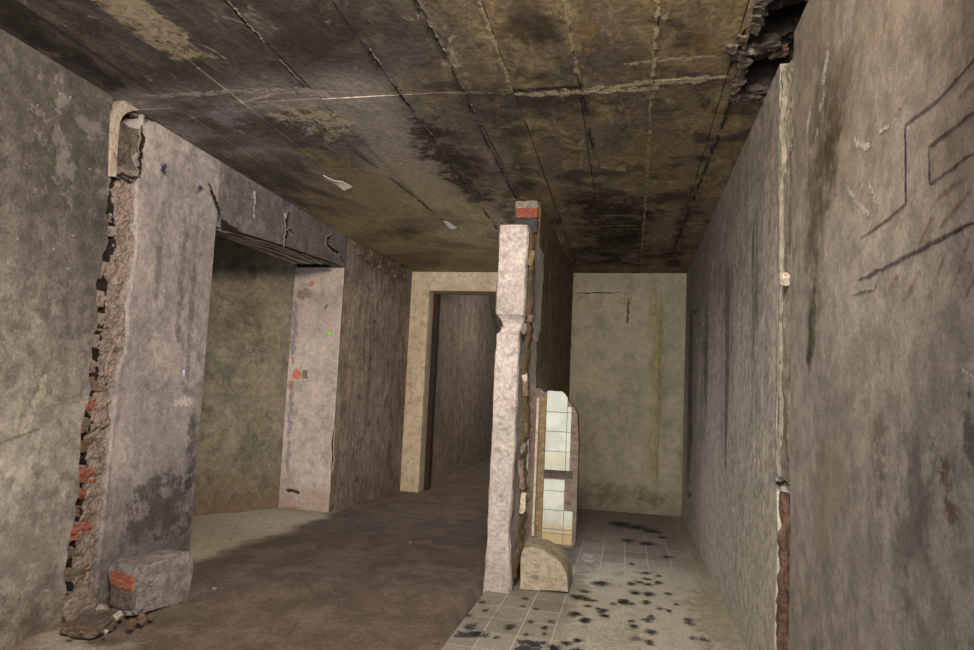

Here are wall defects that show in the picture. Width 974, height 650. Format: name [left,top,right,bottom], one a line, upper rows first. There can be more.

crack [225,0,307,88]
crack [283,211,293,247]
crack [312,118,446,221]
crack [366,47,498,230]
crack [414,0,517,199]
crack [578,80,595,148]
water stain [477,0,756,252]
crack [674,94,734,247]
spalling [726,0,809,105]
water stain [804,89,827,153]
flaking render [63,115,153,599]
flaking render [775,491,791,650]